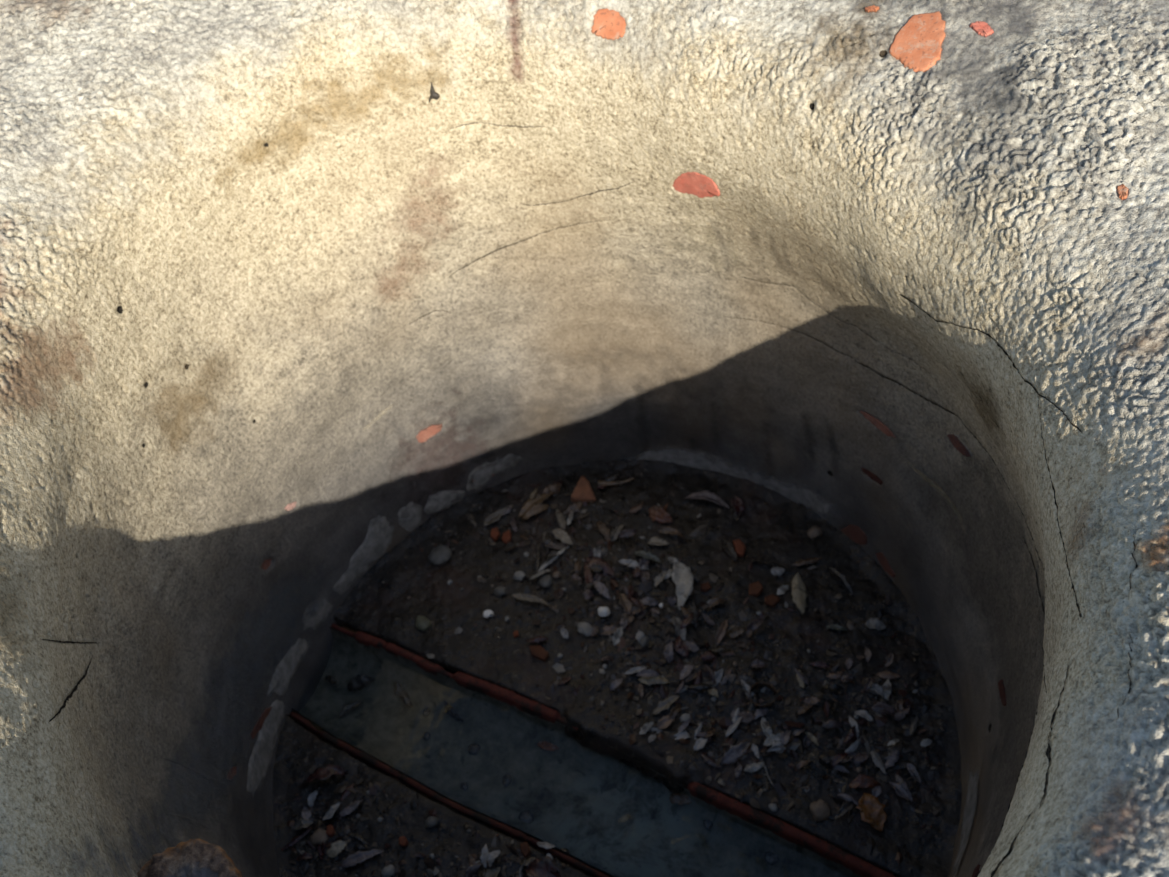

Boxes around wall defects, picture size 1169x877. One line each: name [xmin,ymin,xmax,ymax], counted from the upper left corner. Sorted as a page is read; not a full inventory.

crack [723,276,1081,617]
crack [976,648,1069,877]